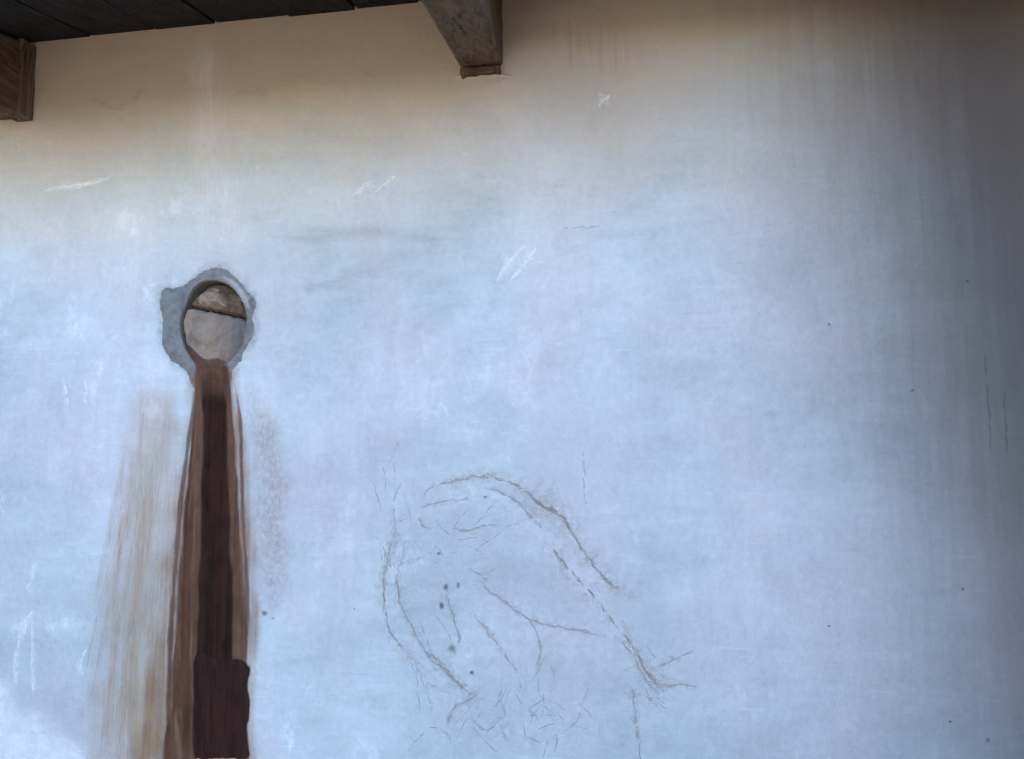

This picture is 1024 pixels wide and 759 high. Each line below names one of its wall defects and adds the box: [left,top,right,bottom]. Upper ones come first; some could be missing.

rust [135,344,258,759]
crack [381,473,695,759]